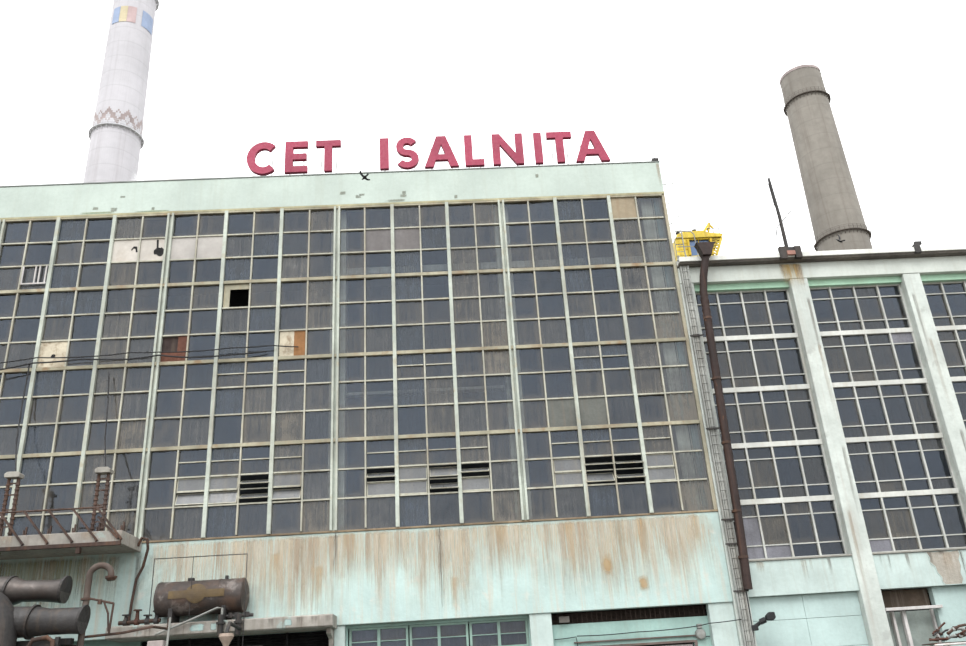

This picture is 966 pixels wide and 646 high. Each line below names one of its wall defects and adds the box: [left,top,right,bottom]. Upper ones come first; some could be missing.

rust [289,522,589,587]
spalling [926,550,964,585]